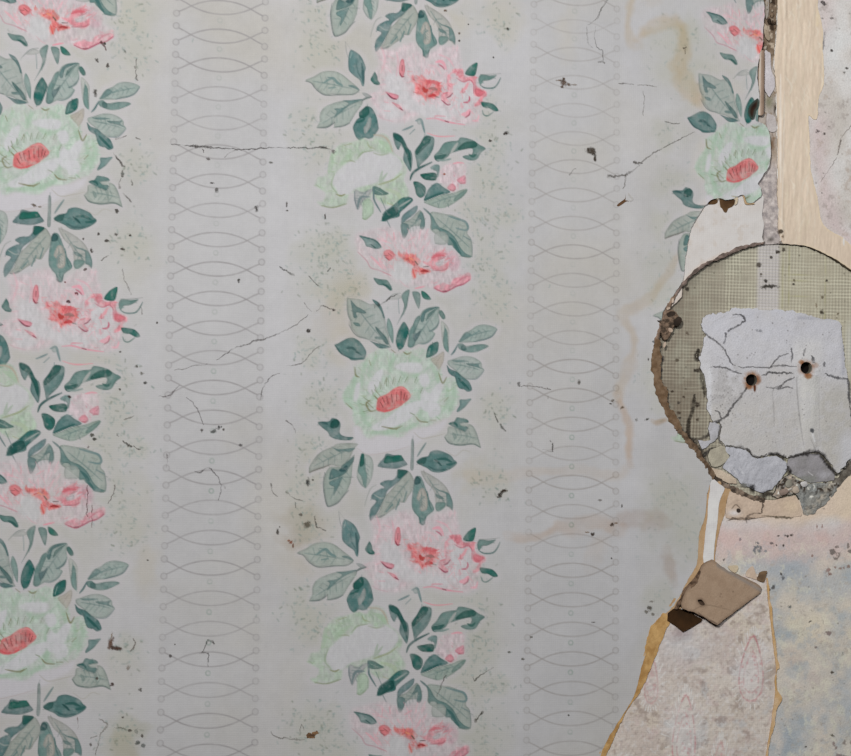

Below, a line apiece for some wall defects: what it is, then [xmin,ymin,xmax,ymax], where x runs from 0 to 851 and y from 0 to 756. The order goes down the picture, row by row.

flaking render [757,0,785,259]
crack [686,314,851,476]